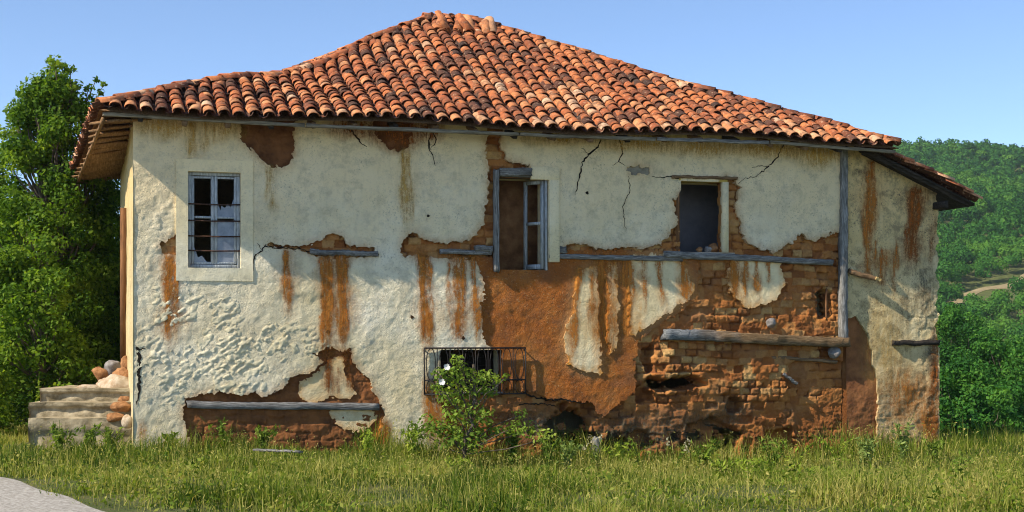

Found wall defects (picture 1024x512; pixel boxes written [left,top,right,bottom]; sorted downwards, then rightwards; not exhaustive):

spalling [240,120,298,168]
spalling [373,121,413,153]
crack [576,139,679,226]
crack [738,145,784,184]
spalling [267,234,374,259]
spalling [400,128,878,462]
crack [136,346,145,404]
spalling [133,281,385,453]